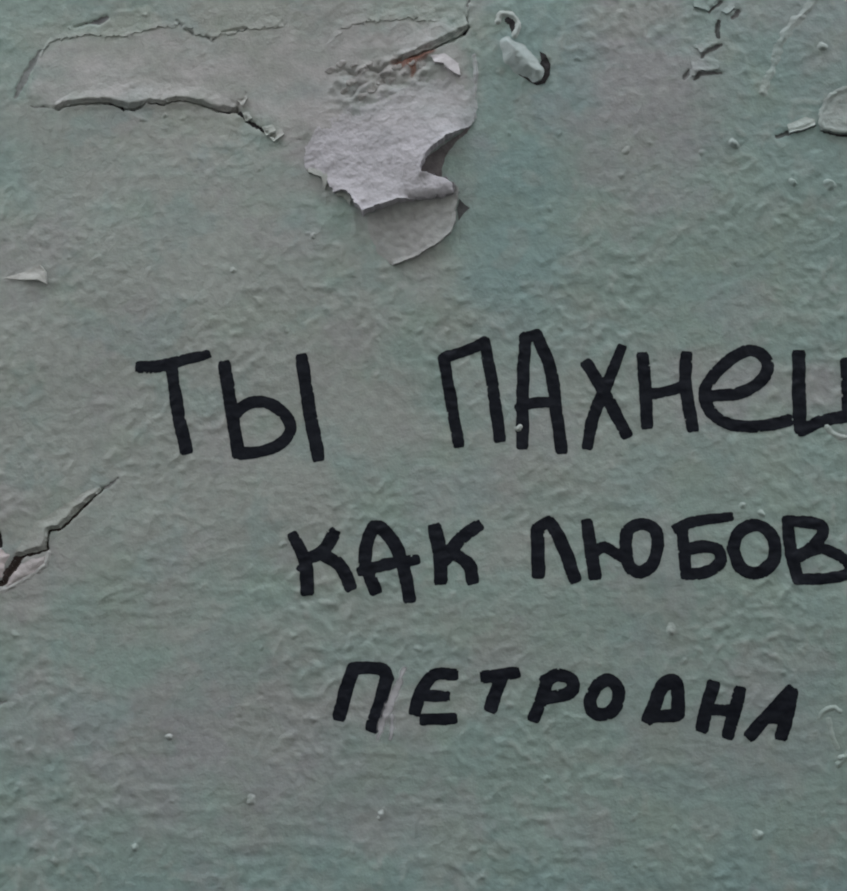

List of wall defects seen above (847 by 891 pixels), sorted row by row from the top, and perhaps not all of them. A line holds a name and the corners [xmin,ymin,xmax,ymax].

crack [31,79,285,142]
peeling [27,3,480,266]
peeling [5,265,48,285]